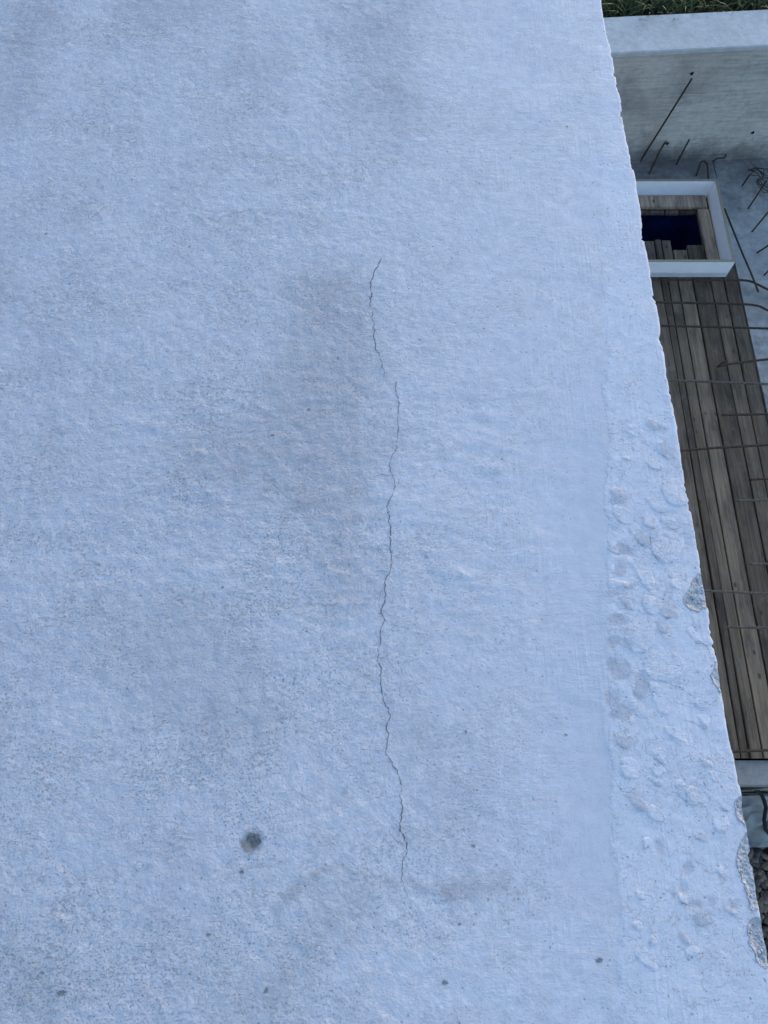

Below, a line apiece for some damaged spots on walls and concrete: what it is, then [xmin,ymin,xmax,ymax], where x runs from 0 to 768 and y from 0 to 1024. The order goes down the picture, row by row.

crack [369,260,408,895]